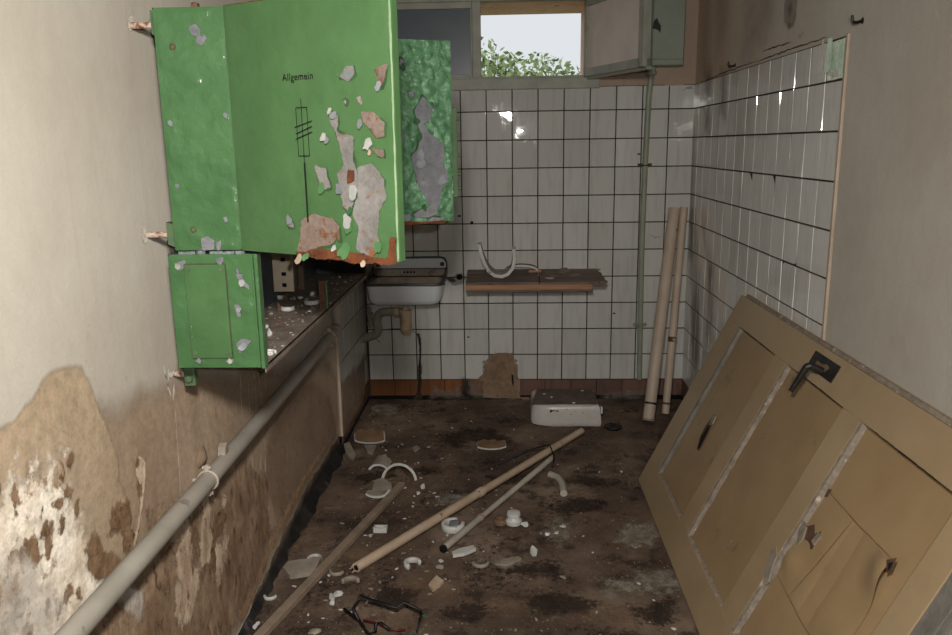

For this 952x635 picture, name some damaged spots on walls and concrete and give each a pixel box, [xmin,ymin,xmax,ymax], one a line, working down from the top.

flaking render [0,450,142,635]
damp [115,565,151,616]
damp [0,367,293,562]
damp [188,357,365,635]